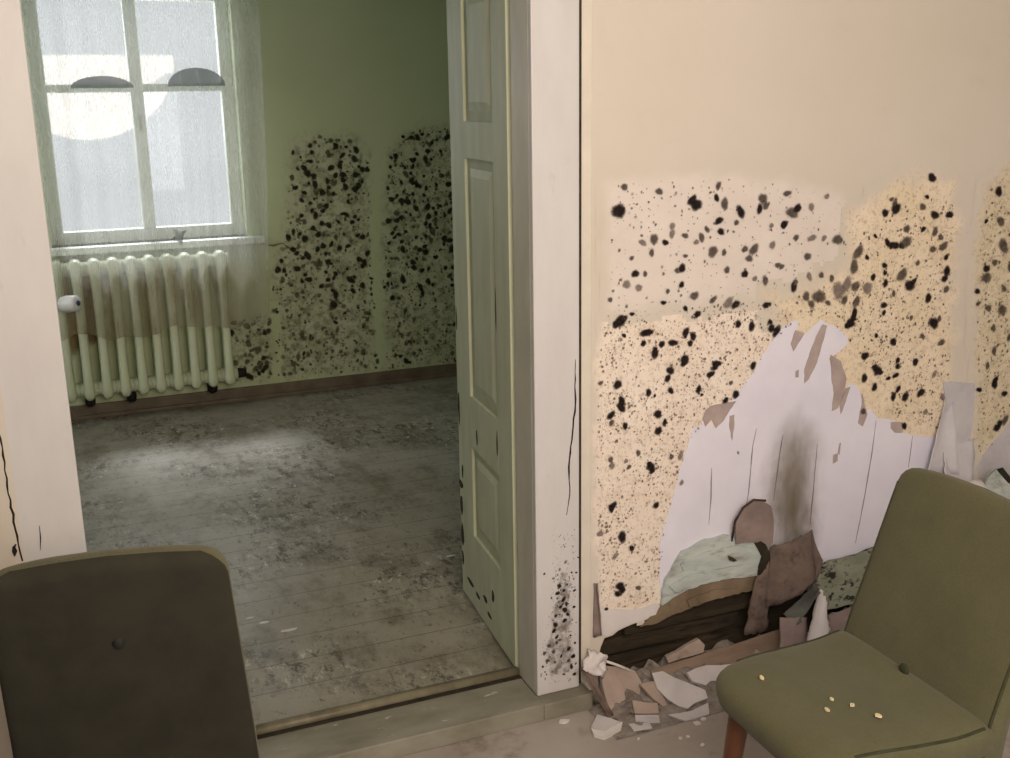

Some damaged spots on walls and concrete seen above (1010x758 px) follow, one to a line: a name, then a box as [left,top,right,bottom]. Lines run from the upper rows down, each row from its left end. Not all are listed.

leakage [216,111,457,389]
crack [0,436,41,561]
crack [566,359,577,515]
leakage [590,154,1010,626]
leakage [541,529,579,681]
flaking render [639,534,770,627]